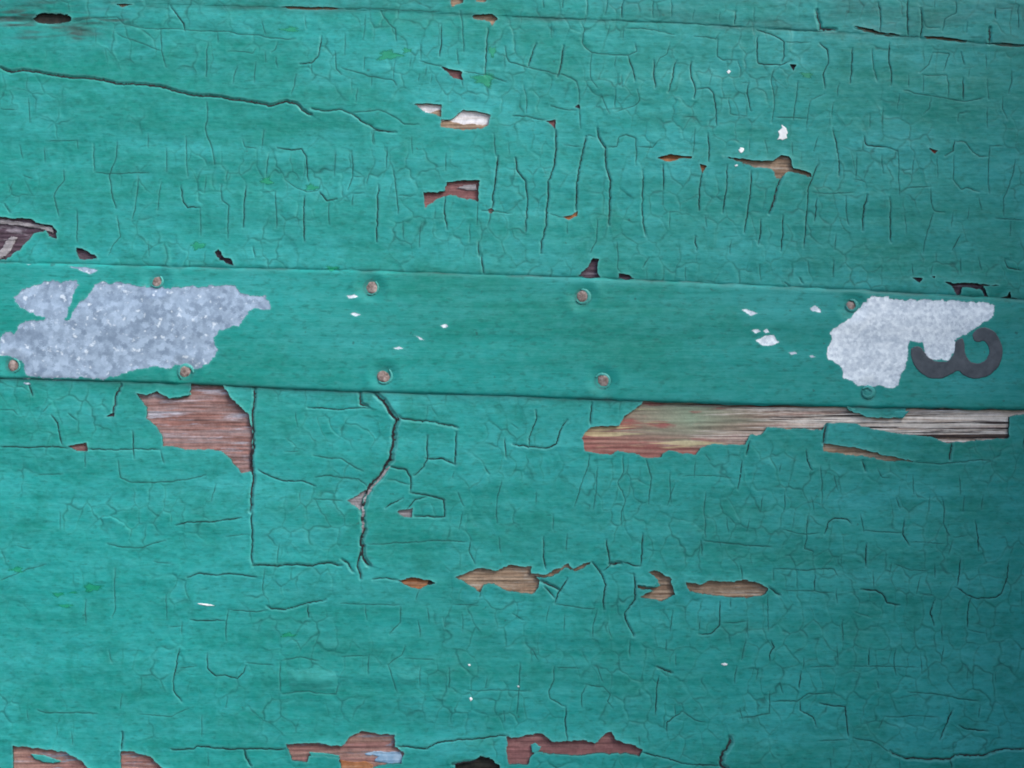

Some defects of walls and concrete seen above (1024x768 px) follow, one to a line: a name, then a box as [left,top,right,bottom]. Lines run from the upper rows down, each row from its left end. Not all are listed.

peeling [415,103,491,130]
crack [2,0,1024,285]
peeling [0,217,57,260]
peeling [0,248,271,384]
peeling [810,276,998,388]
peeling [136,384,253,473]
peeling [582,401,1024,458]
crack [1,385,612,764]
peeling [456,562,590,594]
crack [542,426,1024,768]
peeling [286,731,404,768]
peeling [506,732,643,765]